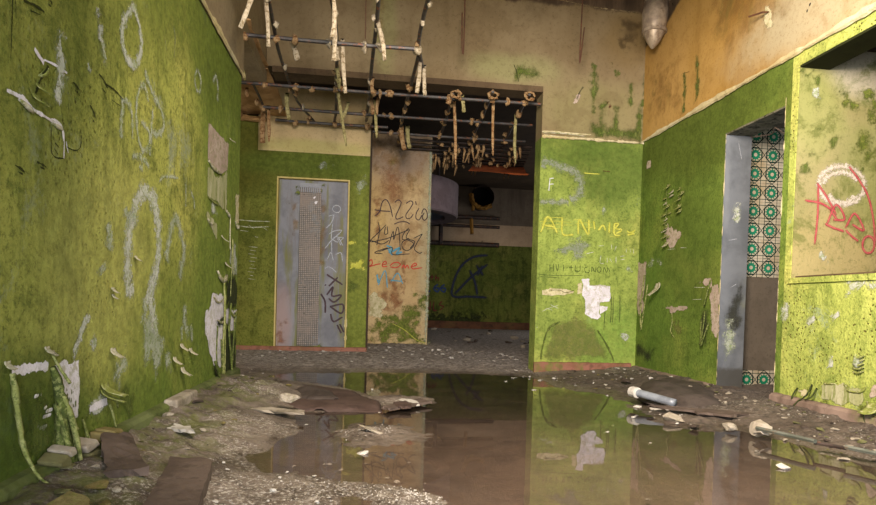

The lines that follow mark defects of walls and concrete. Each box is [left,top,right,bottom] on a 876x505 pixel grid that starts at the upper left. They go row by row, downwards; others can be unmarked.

leakage [591,83,644,140]
peeling [180,124,242,378]
peeling [542,279,620,323]
peeling [4,346,128,483]